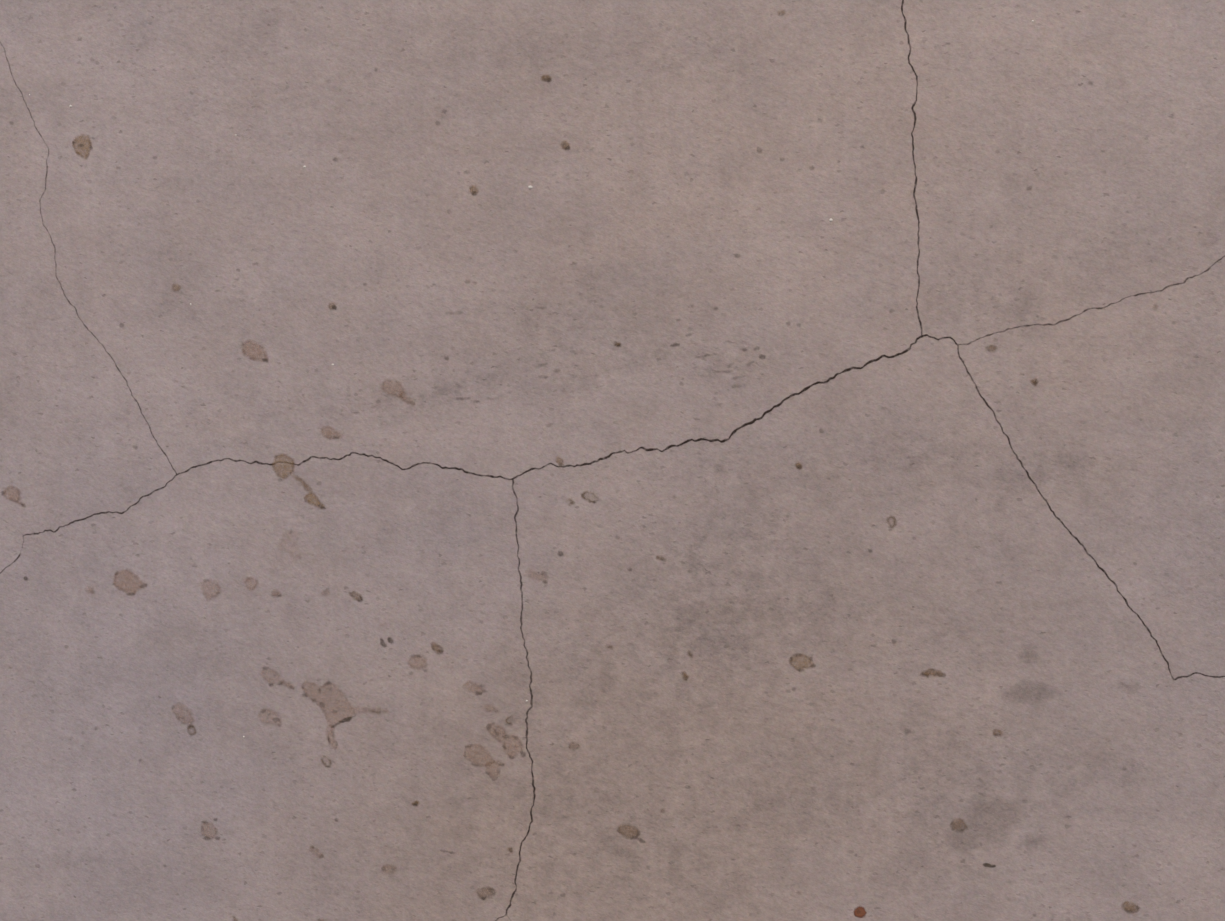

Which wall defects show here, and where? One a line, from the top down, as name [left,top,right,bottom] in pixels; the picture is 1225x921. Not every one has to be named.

crack [25,0,1225,680]
crack [497,558,535,919]